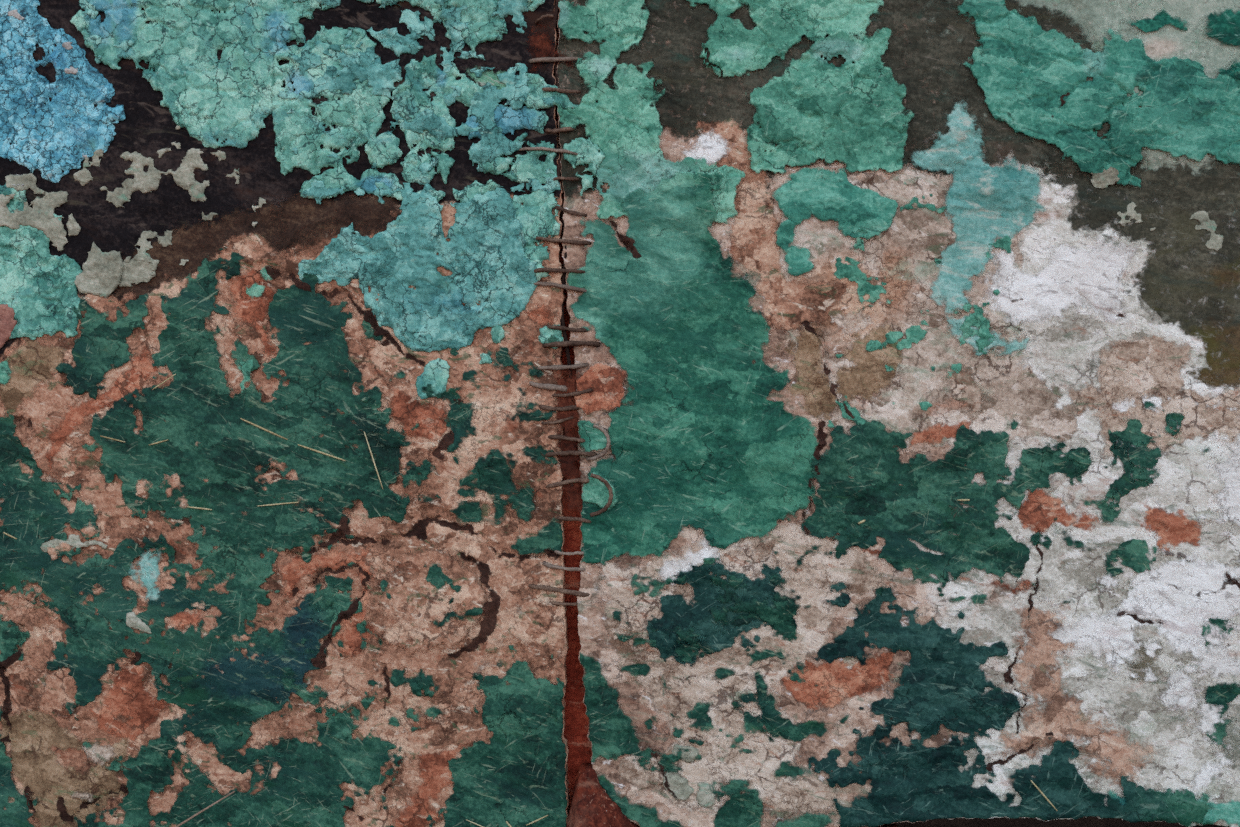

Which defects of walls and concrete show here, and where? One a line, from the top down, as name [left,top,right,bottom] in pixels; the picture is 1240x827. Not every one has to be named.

corrosion [529,24,573,71]
leakage [1069,364,1128,422]
corrosion [553,370,585,515]
peeling [1067,447,1092,466]
peeling [1097,506,1216,591]
crack [291,514,560,669]
peeling [424,563,462,604]
peeling [675,628,699,644]
leakage [1127,645,1162,679]
peeling [1174,665,1240,749]
leakage [1191,715,1240,795]
peeling [598,774,683,827]